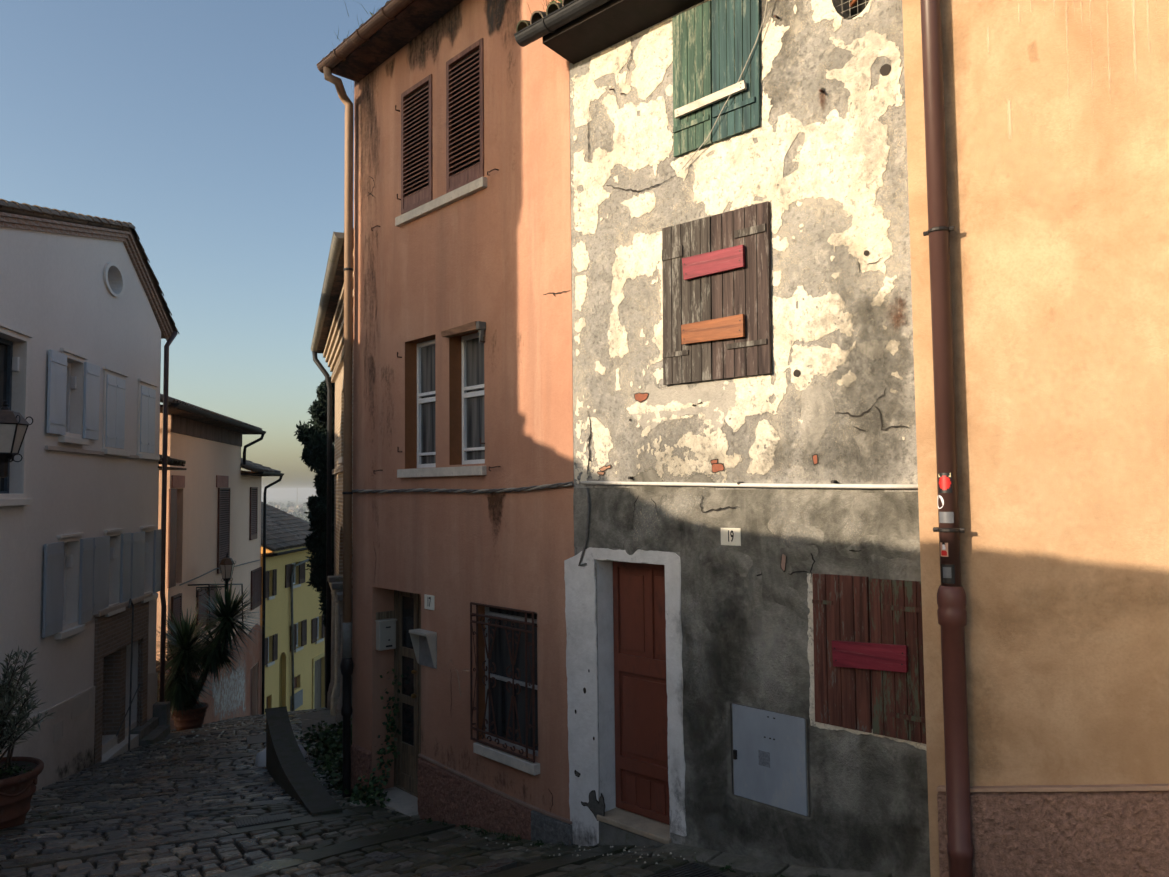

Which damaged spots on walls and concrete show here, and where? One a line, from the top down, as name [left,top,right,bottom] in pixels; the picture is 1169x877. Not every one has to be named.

water stain [486,0,520,35]
water stain [354,59,395,161]
peeling [570,0,904,484]
crack [836,388,909,431]